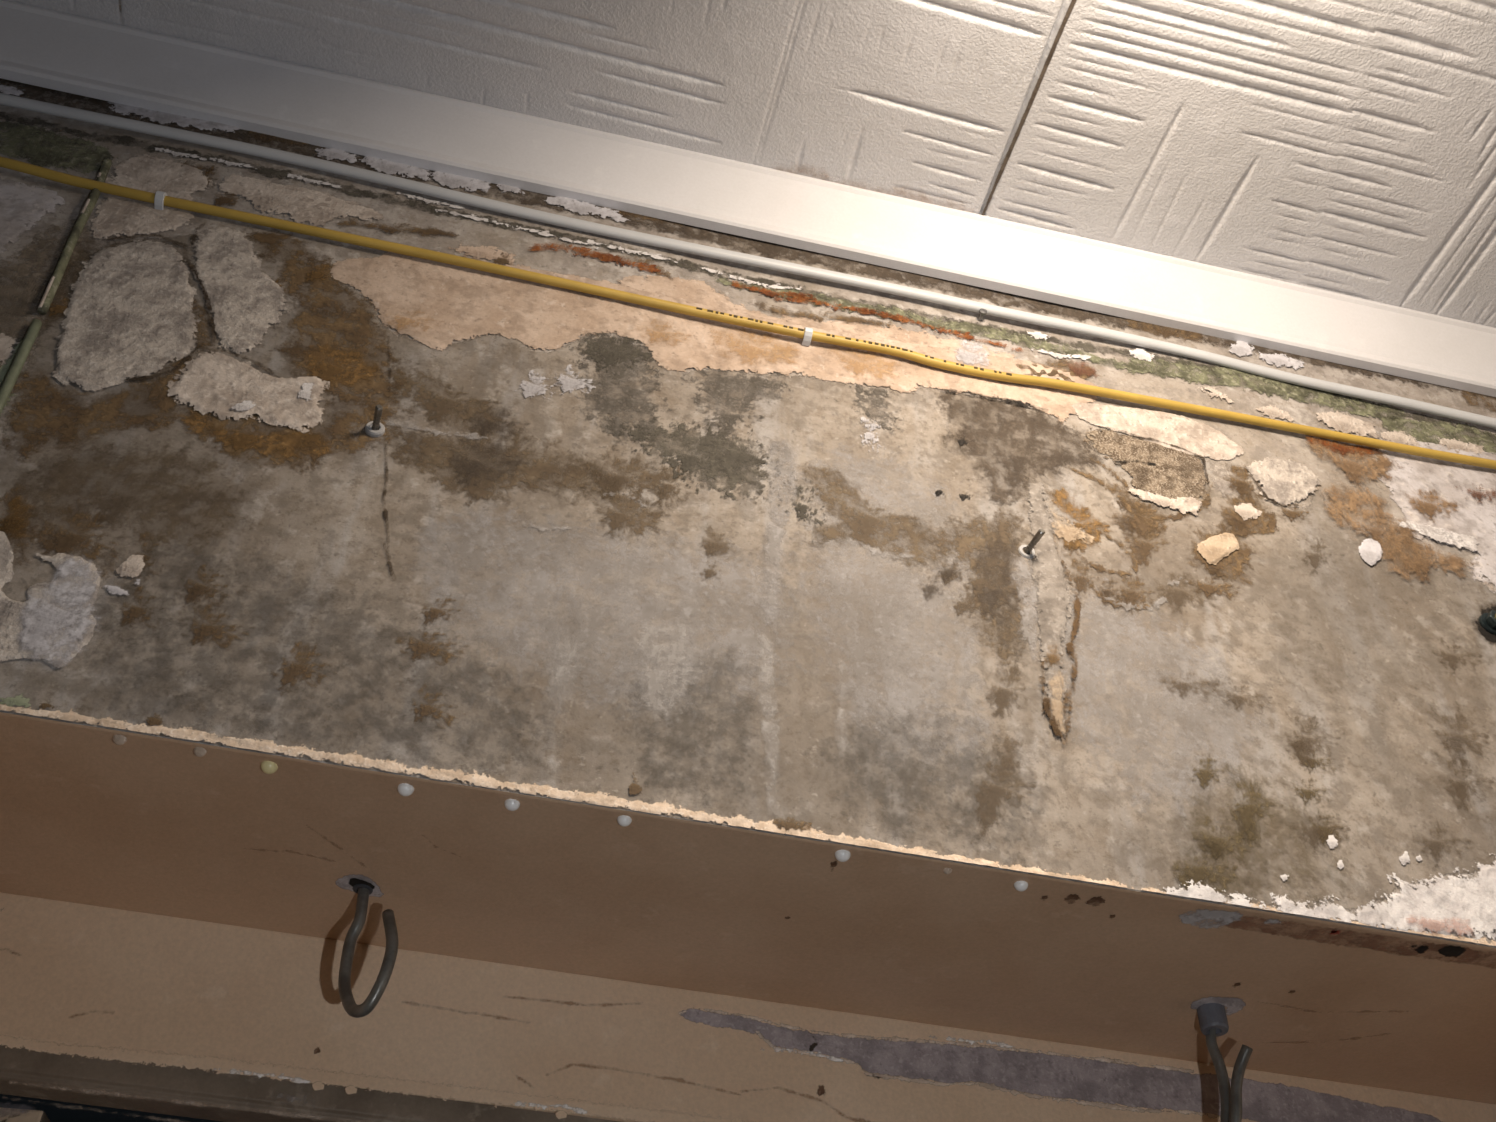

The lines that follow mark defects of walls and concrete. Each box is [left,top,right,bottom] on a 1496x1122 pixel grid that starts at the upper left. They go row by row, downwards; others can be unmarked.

crack [107,227,279,381]
crack [383,445,394,575]
damp [387,332,961,741]
flaking render [0,112,1496,968]
damp [954,593,973,615]
damp [935,389,1155,506]
damp [1291,717,1344,869]
damp [1156,758,1496,940]
damp [1433,710,1492,808]